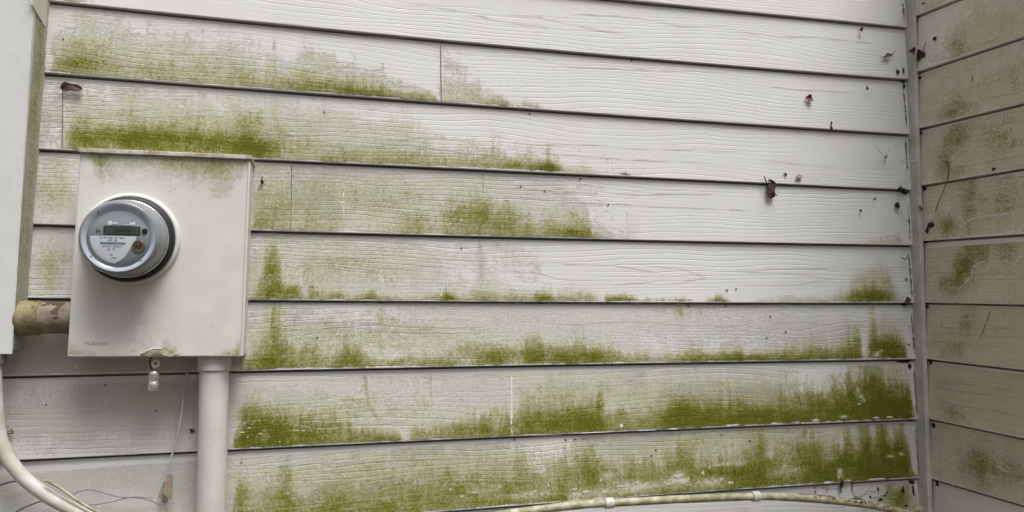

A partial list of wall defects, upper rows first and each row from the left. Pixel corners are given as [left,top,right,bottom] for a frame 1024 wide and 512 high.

damp [228,166,915,443]
damp [917,0,1024,504]
damp [226,429,751,509]